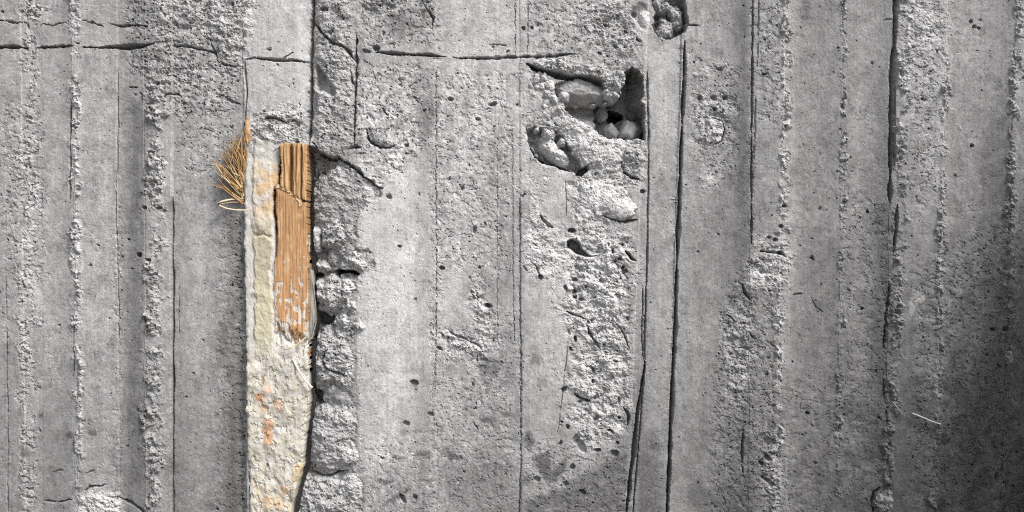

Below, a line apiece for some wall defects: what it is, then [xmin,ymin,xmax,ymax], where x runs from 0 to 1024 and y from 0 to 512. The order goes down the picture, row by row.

spalling [249,0,410,512]
spalling [416,0,434,17]
crack [351,0,576,386]
crack [470,134,569,512]
spalling [522,0,684,497]
crack [621,23,700,512]
crack [882,379,890,423]
crack [882,284,892,349]
crack [883,0,928,254]